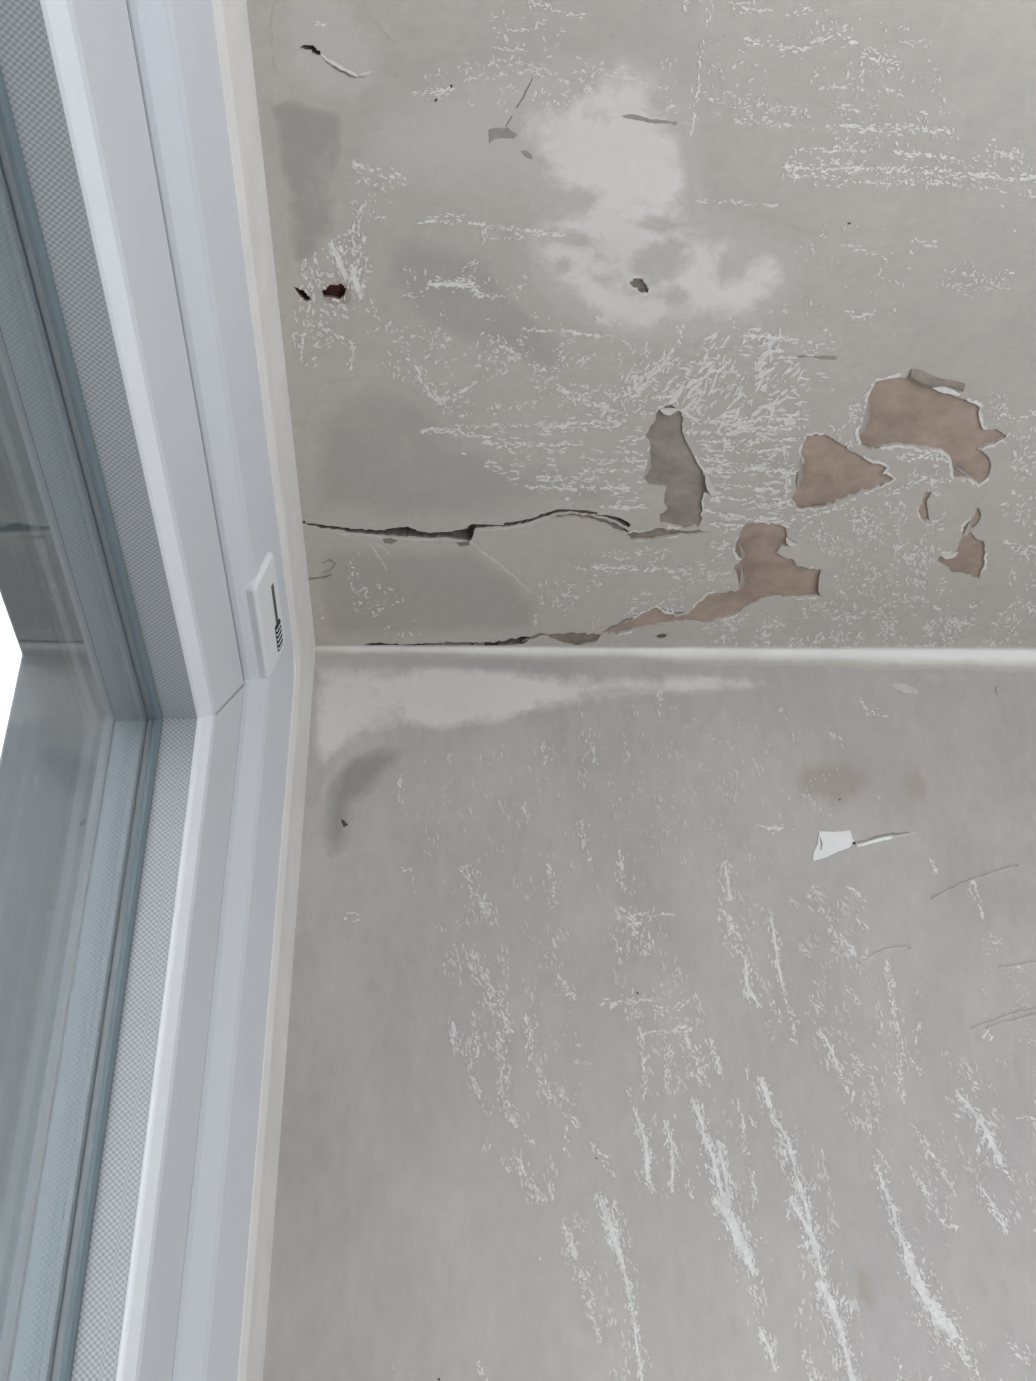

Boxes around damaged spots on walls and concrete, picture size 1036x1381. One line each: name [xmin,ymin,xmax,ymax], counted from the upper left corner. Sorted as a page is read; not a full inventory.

water stain [263,0,822,645]
crack [303,509,630,600]
crack [368,606,684,646]
peeling [624,402,718,542]
peeling [608,520,821,638]
water stain [685,401,856,536]
peeling [793,369,1005,512]
water stain [878,450,952,497]
peeling [916,492,930,522]
peeling [938,508,988,577]
water stain [310,662,940,869]
flaking render [813,831,916,861]